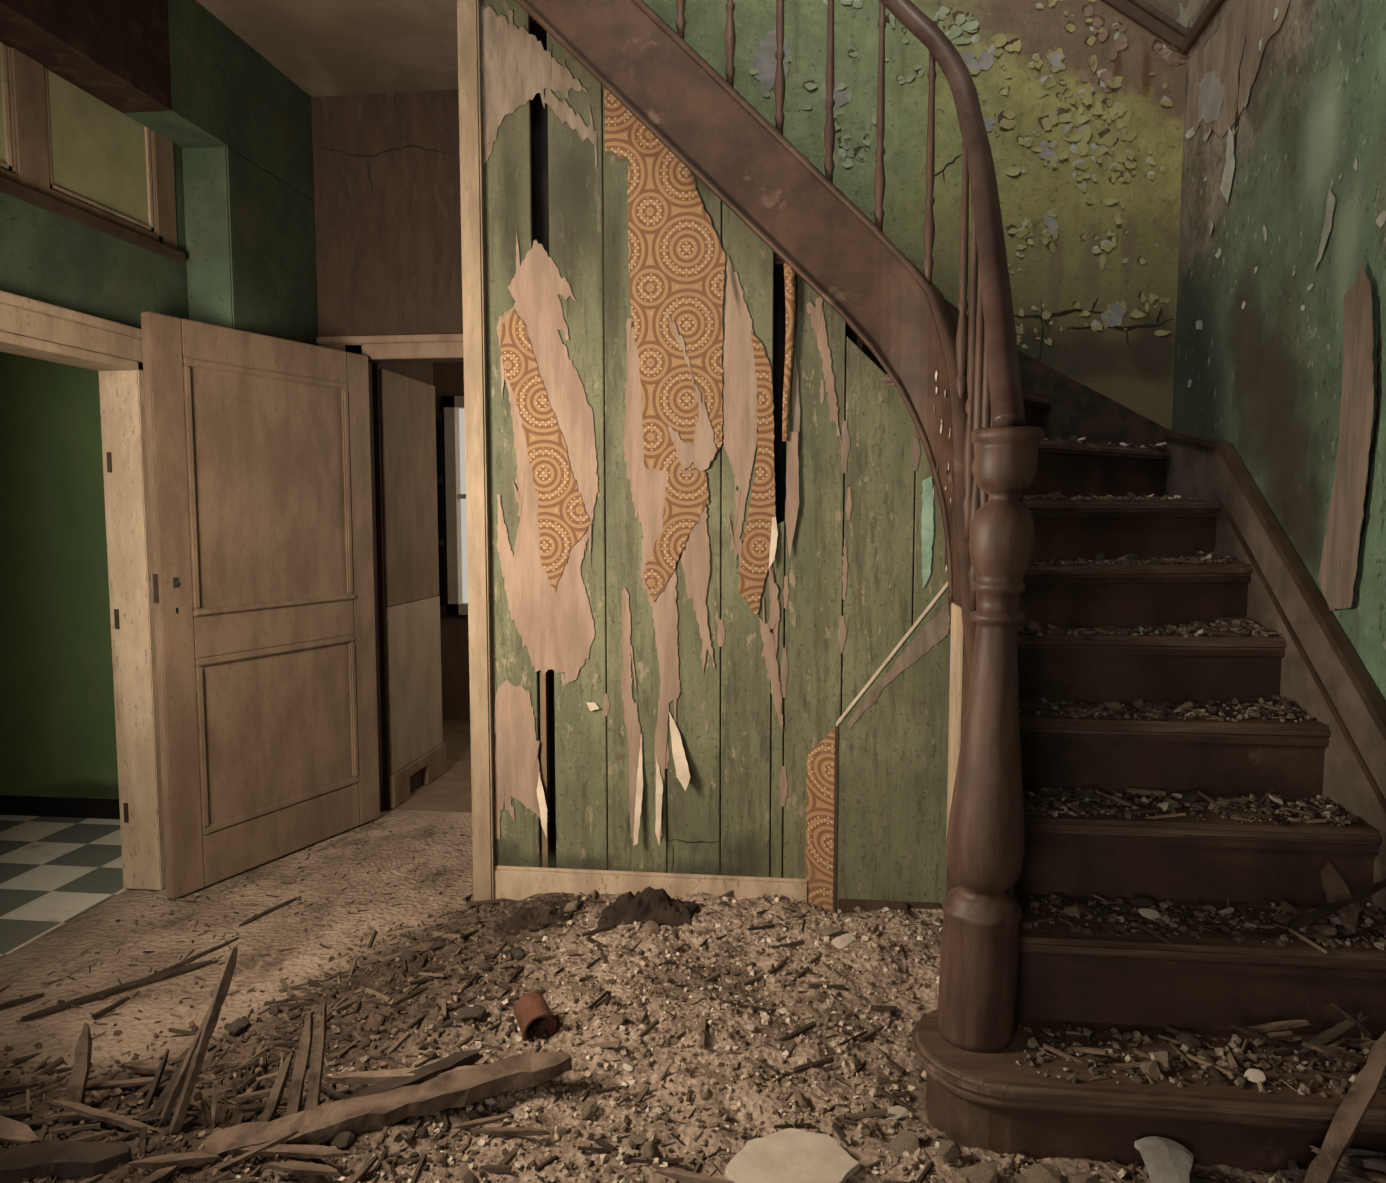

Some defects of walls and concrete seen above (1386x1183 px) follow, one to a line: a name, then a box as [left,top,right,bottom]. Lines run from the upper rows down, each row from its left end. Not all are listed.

flaking render [749,29,792,97]
peeling [801,75,877,168]
peeling [932,0,1165,274]
peeling [1015,303,1063,349]
peeling [1073,291,1171,332]
peeling [840,421,852,520]
peeling [1317,261,1381,611]
peeling [717,619,725,647]
peeling [837,539,848,653]